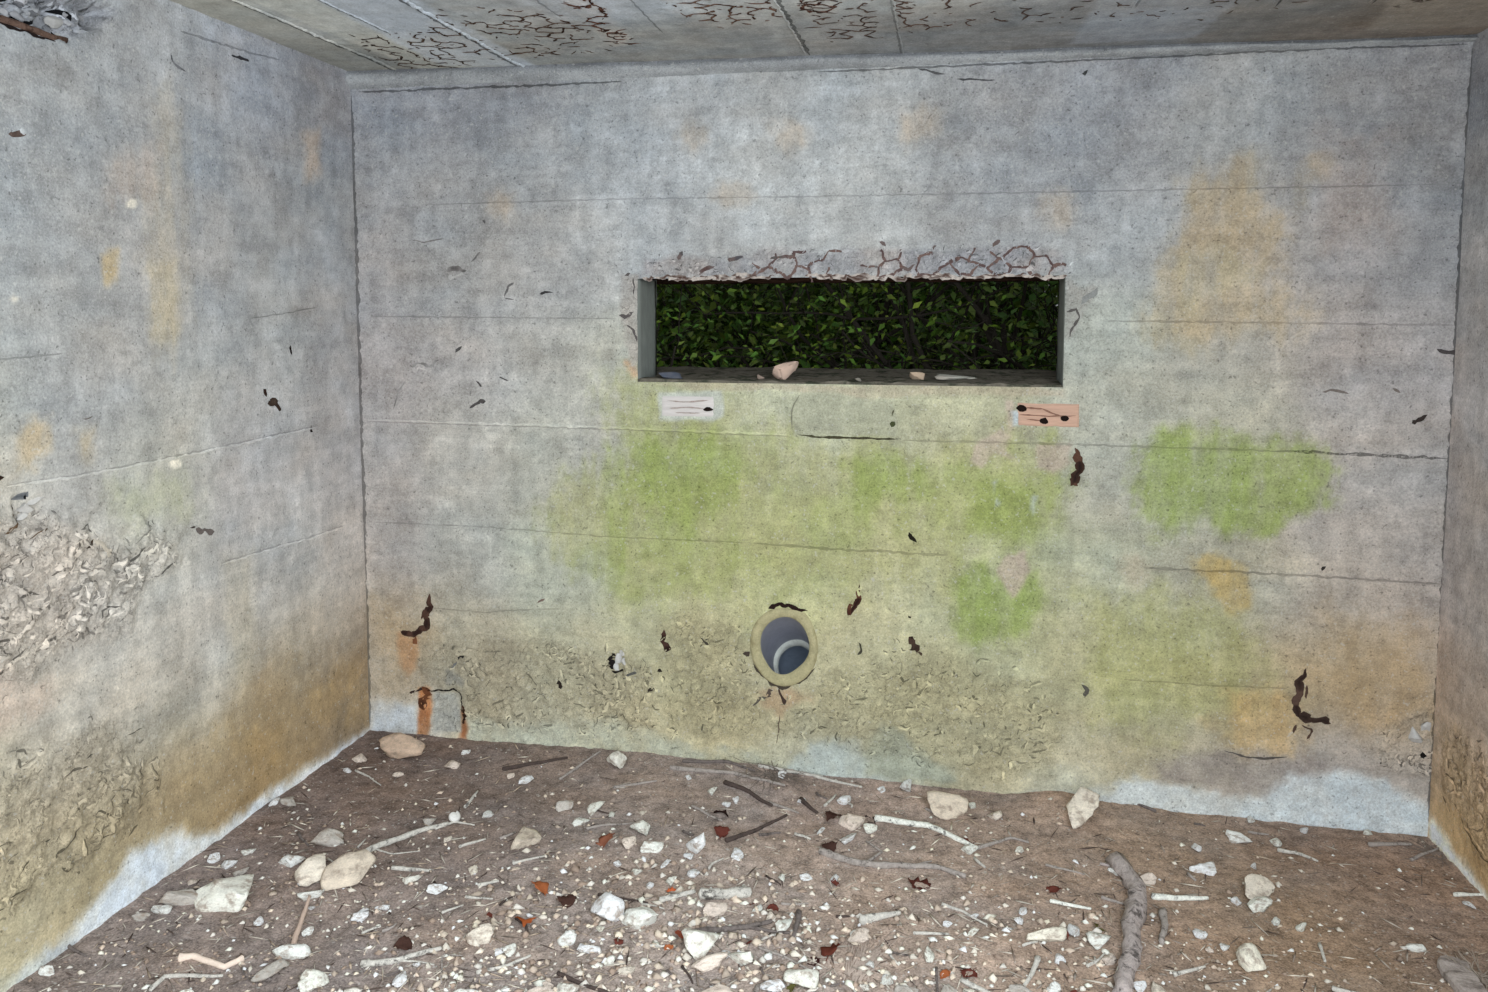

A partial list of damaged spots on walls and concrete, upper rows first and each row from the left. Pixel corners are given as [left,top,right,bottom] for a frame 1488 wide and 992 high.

spalling [0,0,122,46]
crack [343,0,641,69]
crack [656,0,1326,45]
crack [918,68,993,81]
peeling [167,456,185,471]
flaking render [0,495,215,935]
corrosion [455,705,471,739]